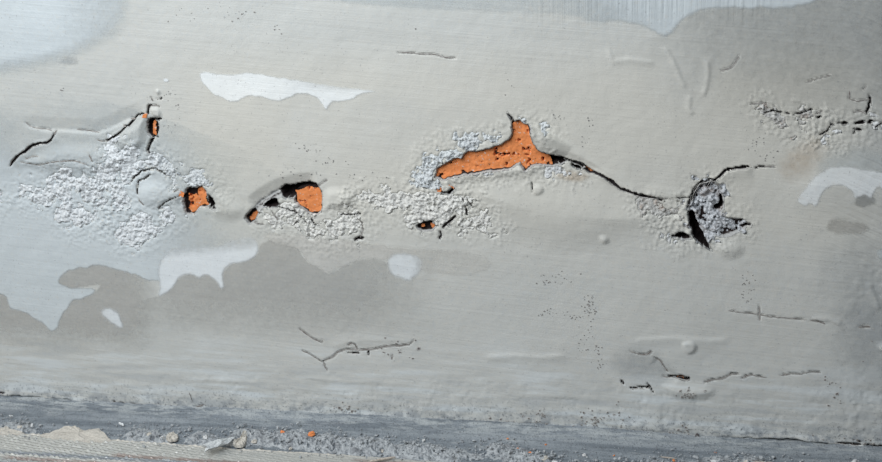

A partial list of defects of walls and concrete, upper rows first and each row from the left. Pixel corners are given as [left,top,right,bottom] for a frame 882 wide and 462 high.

crack [749,86,882,135]
crack [9,97,179,209]
spalling [14,132,217,250]
spalling [244,113,596,242]
crack [564,158,775,206]
spalling [636,174,752,251]
leakage [0,294,47,331]
leakage [59,265,138,333]
leakage [167,241,374,306]
crack [298,328,414,370]
crack [621,351,821,392]